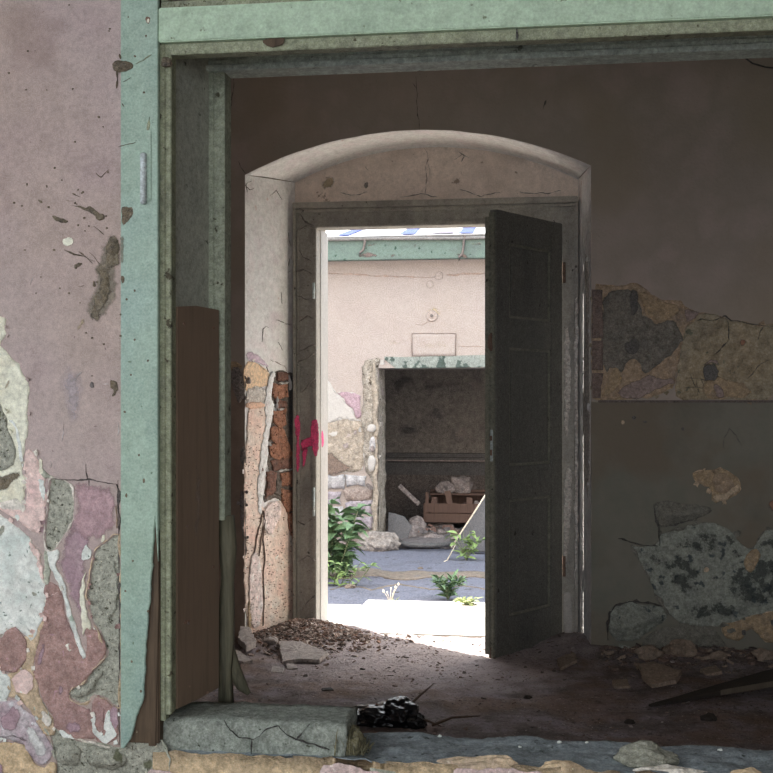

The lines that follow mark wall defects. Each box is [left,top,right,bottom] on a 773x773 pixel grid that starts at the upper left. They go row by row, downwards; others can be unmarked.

peeling [0,316,172,773]
crack [57,466,121,563]
crack [115,582,123,680]
flaking render [231,352,293,558]
flaking render [328,358,386,532]
flaking render [564,254,773,643]
crack [224,720,329,754]